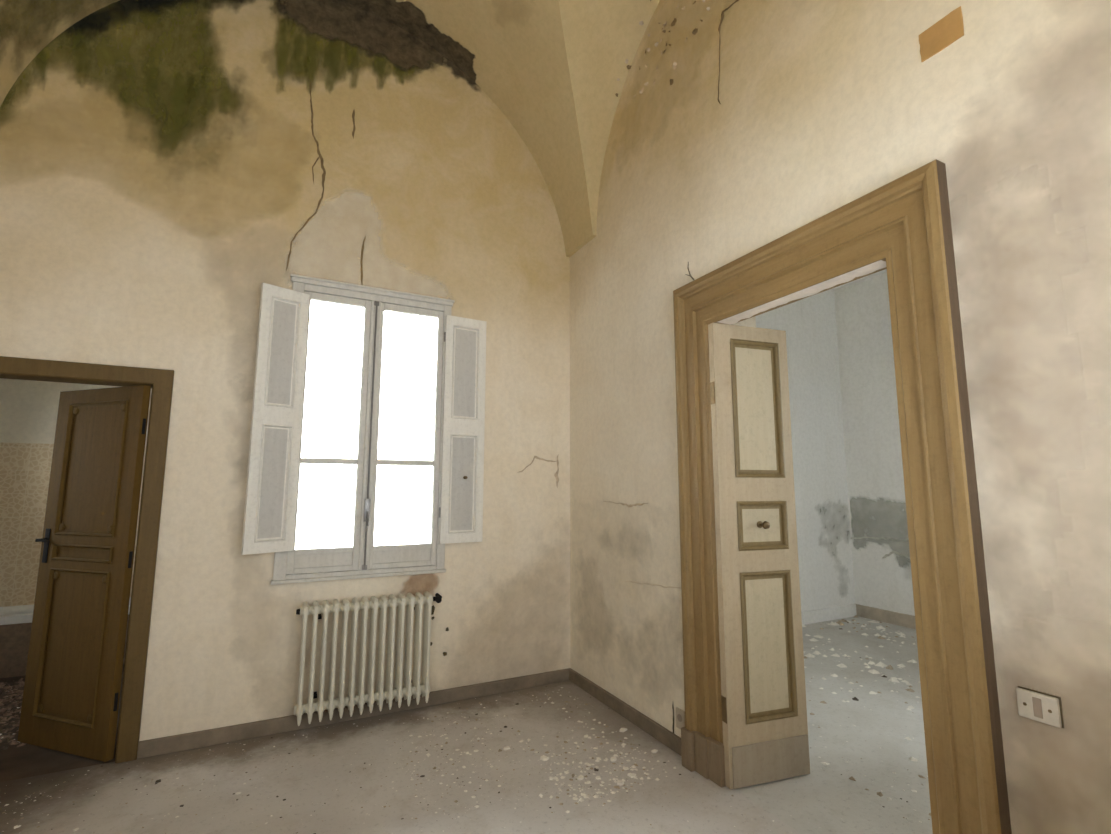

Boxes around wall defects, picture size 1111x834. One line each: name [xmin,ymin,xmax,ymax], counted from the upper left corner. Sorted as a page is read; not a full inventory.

leakage [0,0,245,147]
flaking render [275,0,478,90]
crack [718,0,739,104]
crack [286,81,326,270]